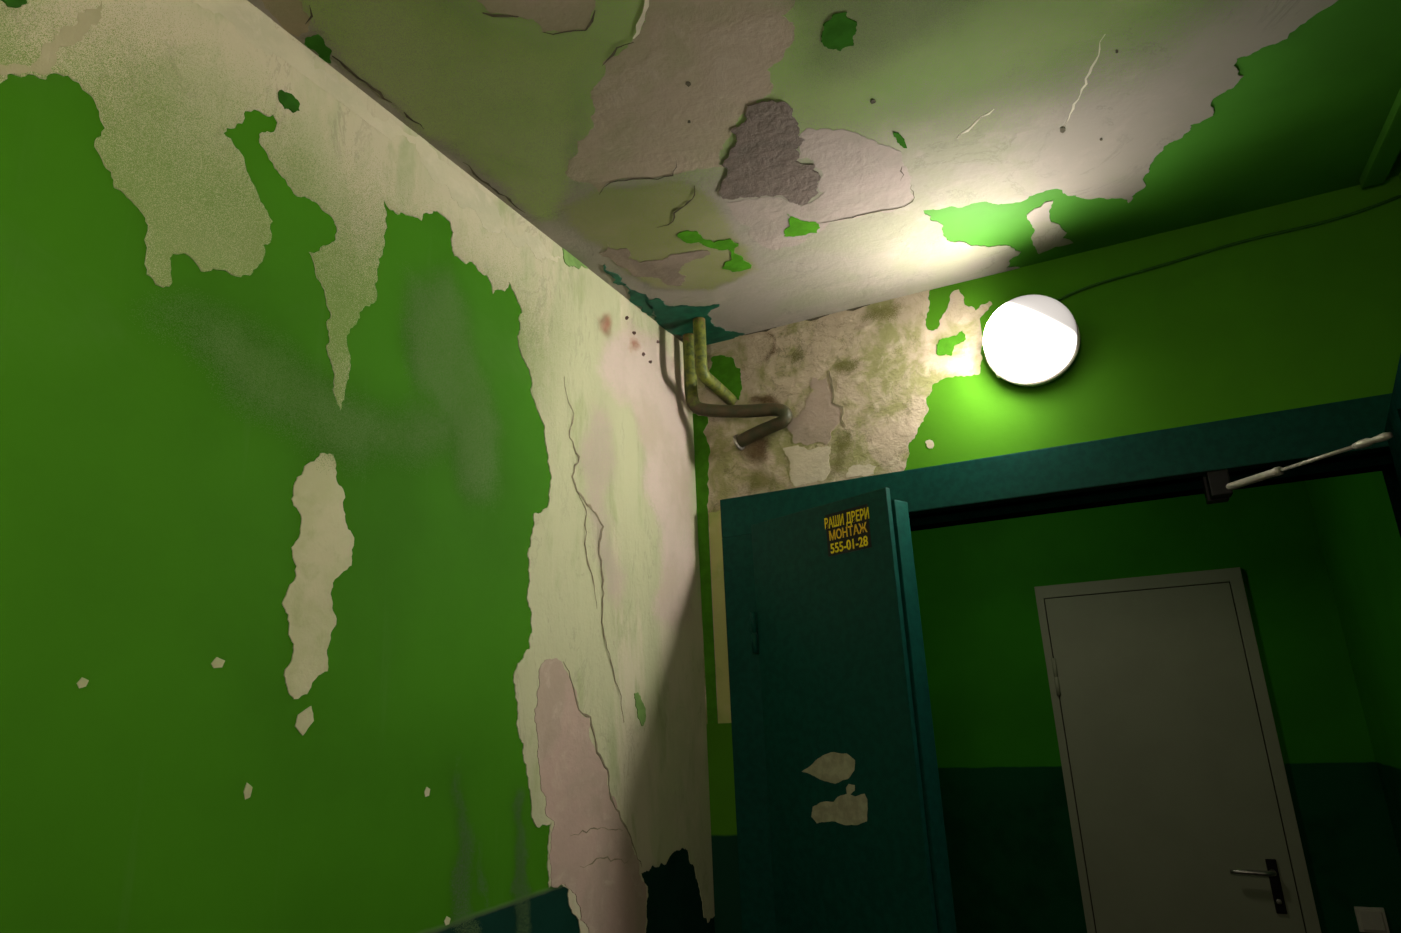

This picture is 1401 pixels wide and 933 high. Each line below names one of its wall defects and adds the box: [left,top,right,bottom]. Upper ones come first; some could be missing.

peeling [247,0,1338,335]
peeling [0,0,992,933]
crack [563,377,642,868]